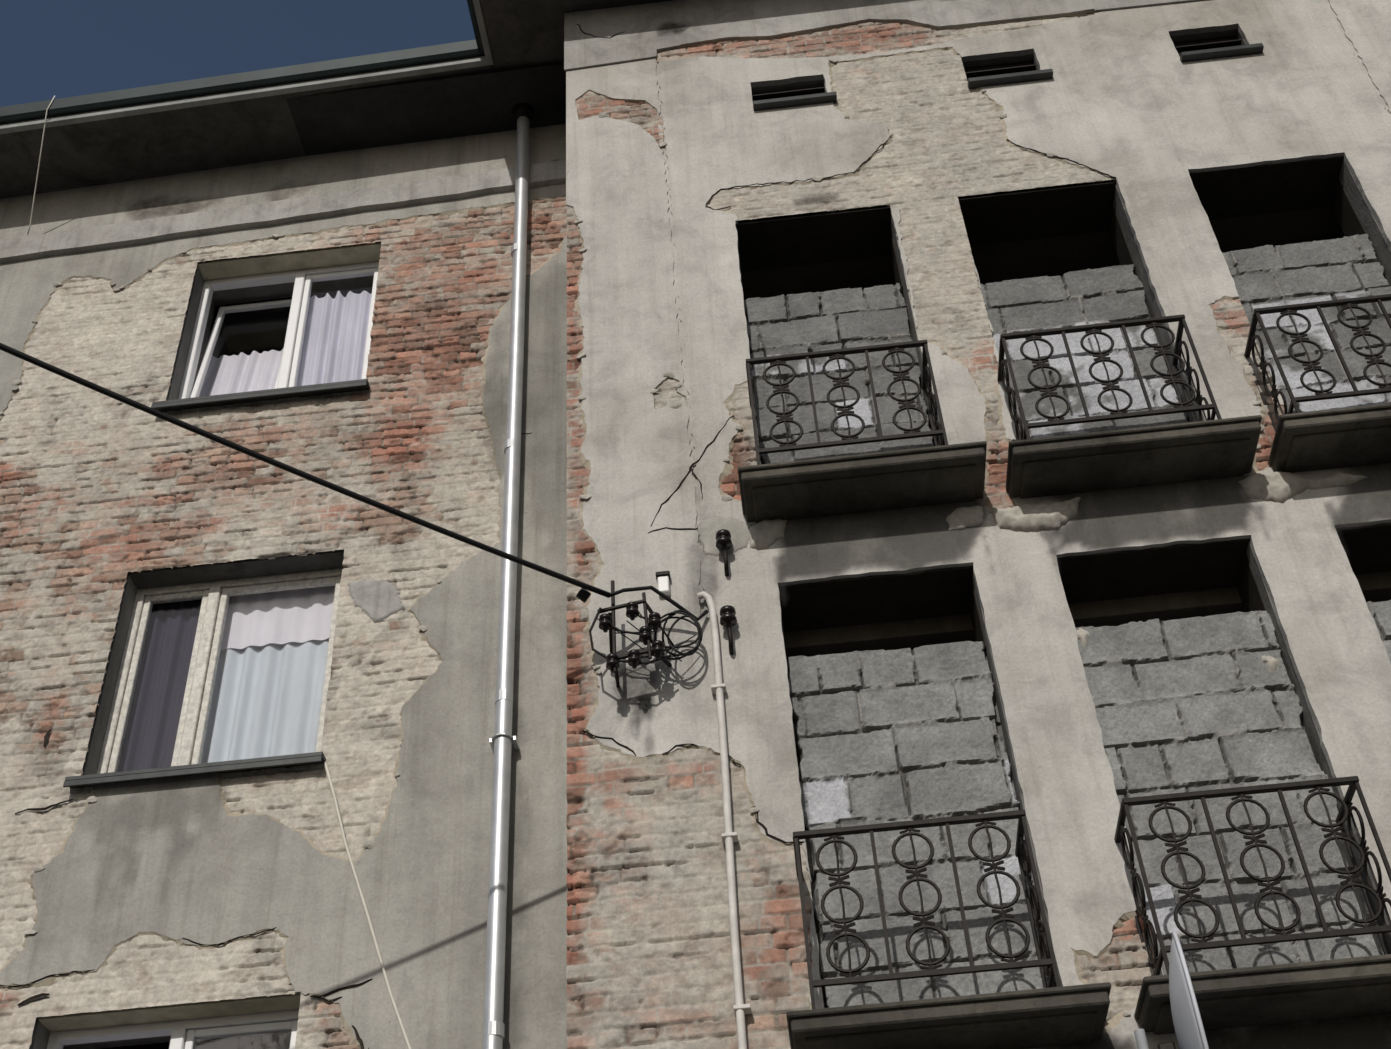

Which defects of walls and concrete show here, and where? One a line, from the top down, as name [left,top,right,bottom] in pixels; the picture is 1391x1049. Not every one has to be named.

spalling [575,90,667,152]
spalling [656,11,1116,513]
crack [648,415,734,533]
spalling [1209,296,1284,475]
spalling [0,195,815,1049]
crack [310,979,373,1049]